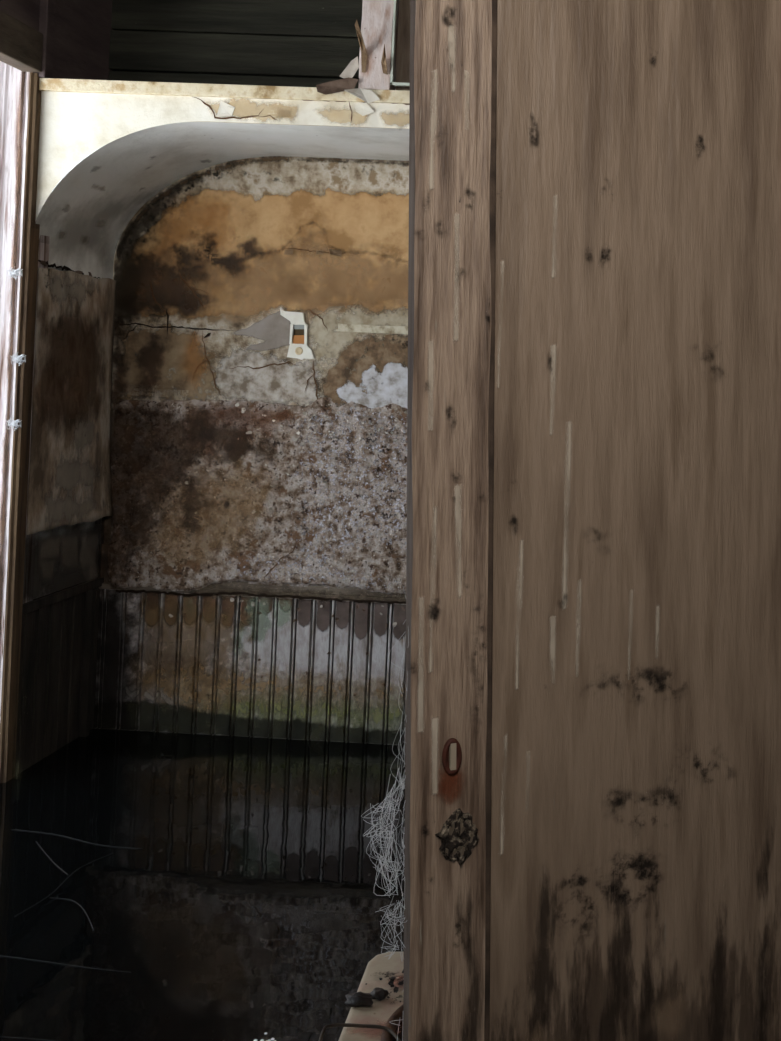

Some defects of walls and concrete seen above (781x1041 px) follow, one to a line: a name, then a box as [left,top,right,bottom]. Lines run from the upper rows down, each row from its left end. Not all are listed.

peeling [211,99,297,121]
peeling [316,20,409,125]
damp [23,222,408,745]
spalling [107,188,419,640]